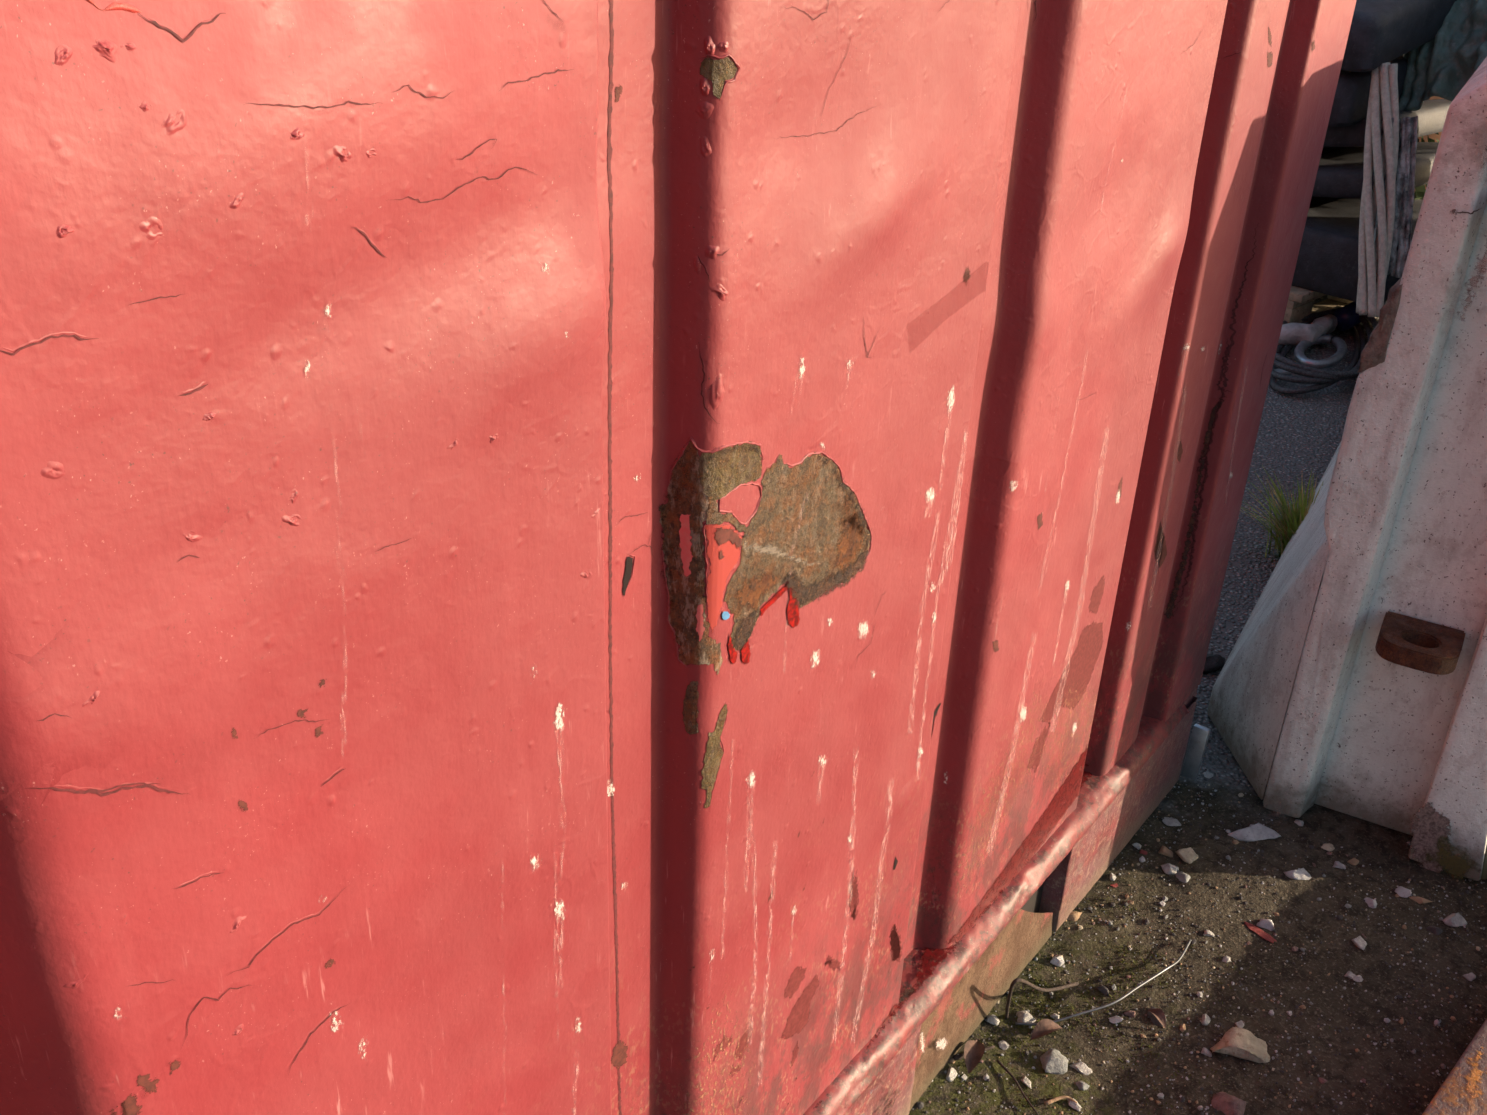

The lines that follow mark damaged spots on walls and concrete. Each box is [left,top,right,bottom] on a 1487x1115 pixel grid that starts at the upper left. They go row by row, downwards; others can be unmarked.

crack [139,13,226,43]
crack [247,85,450,109]
peeling [695,35,740,158]
crack [774,2,873,139]
crack [386,139,536,203]
rust [657,437,872,808]
crack [25,782,188,796]
crack [130,886,348,1046]
crack [289,1002,352,1072]